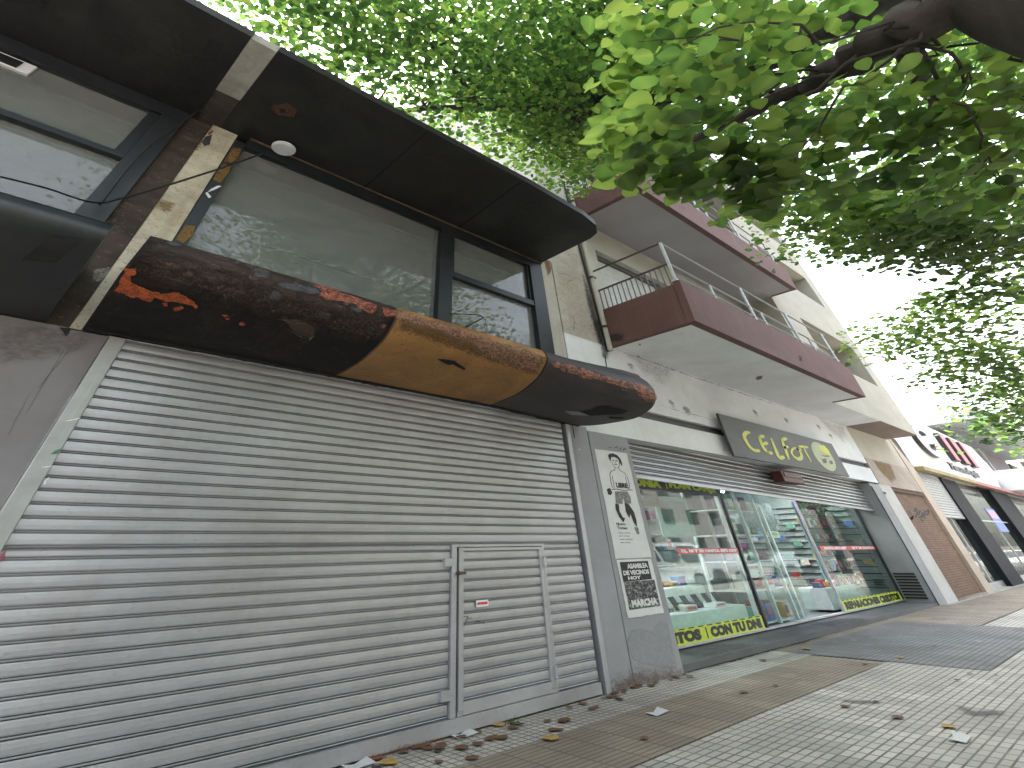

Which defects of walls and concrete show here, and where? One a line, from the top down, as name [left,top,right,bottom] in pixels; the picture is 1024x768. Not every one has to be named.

corrosion [313,283,541,372]